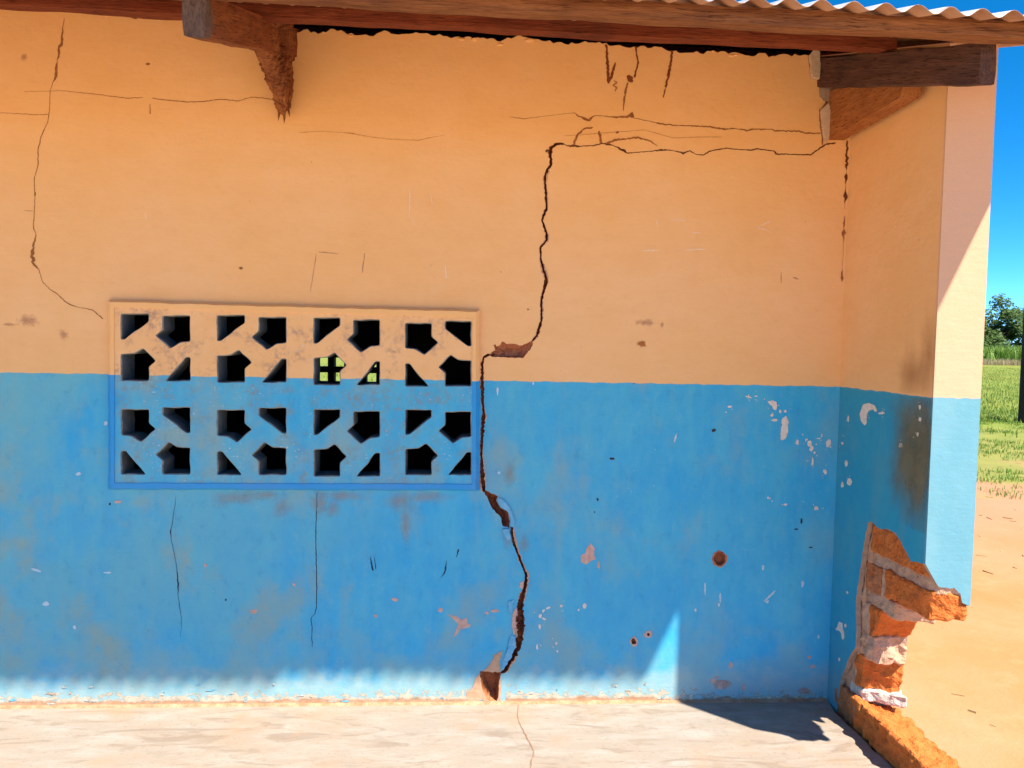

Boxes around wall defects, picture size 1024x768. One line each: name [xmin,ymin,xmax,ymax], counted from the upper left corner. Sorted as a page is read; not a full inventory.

crack [12,22,272,319]
crack [513,102,849,342]
crack [479,354,495,492]
peeling [746,391,844,475]
peeling [846,403,885,425]
crack [310,497,318,647]
spalling [0,525,967,768]
crack [501,527,529,673]